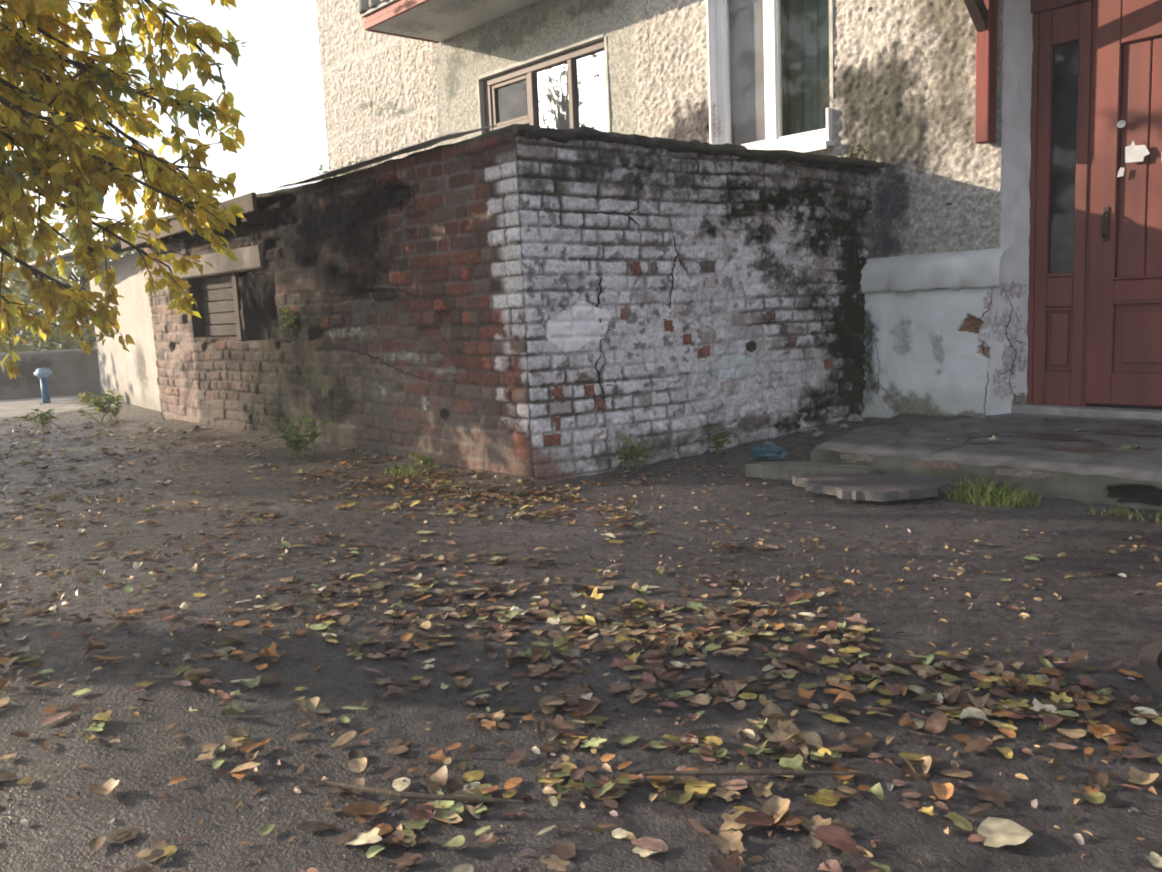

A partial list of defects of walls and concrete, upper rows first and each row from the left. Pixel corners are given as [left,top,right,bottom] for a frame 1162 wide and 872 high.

water stain [628,0,1162,457]
peeling [630,260,659,274]
spalling [696,261,715,273]
crack [595,266,614,402]
peeling [663,319,711,358]
peeling [958,281,1027,407]
peeling [482,355,523,395]
crack [930,283,1026,457]
peeling [582,384,606,410]
peeling [511,415,562,456]
spalling [1107,484,1162,506]